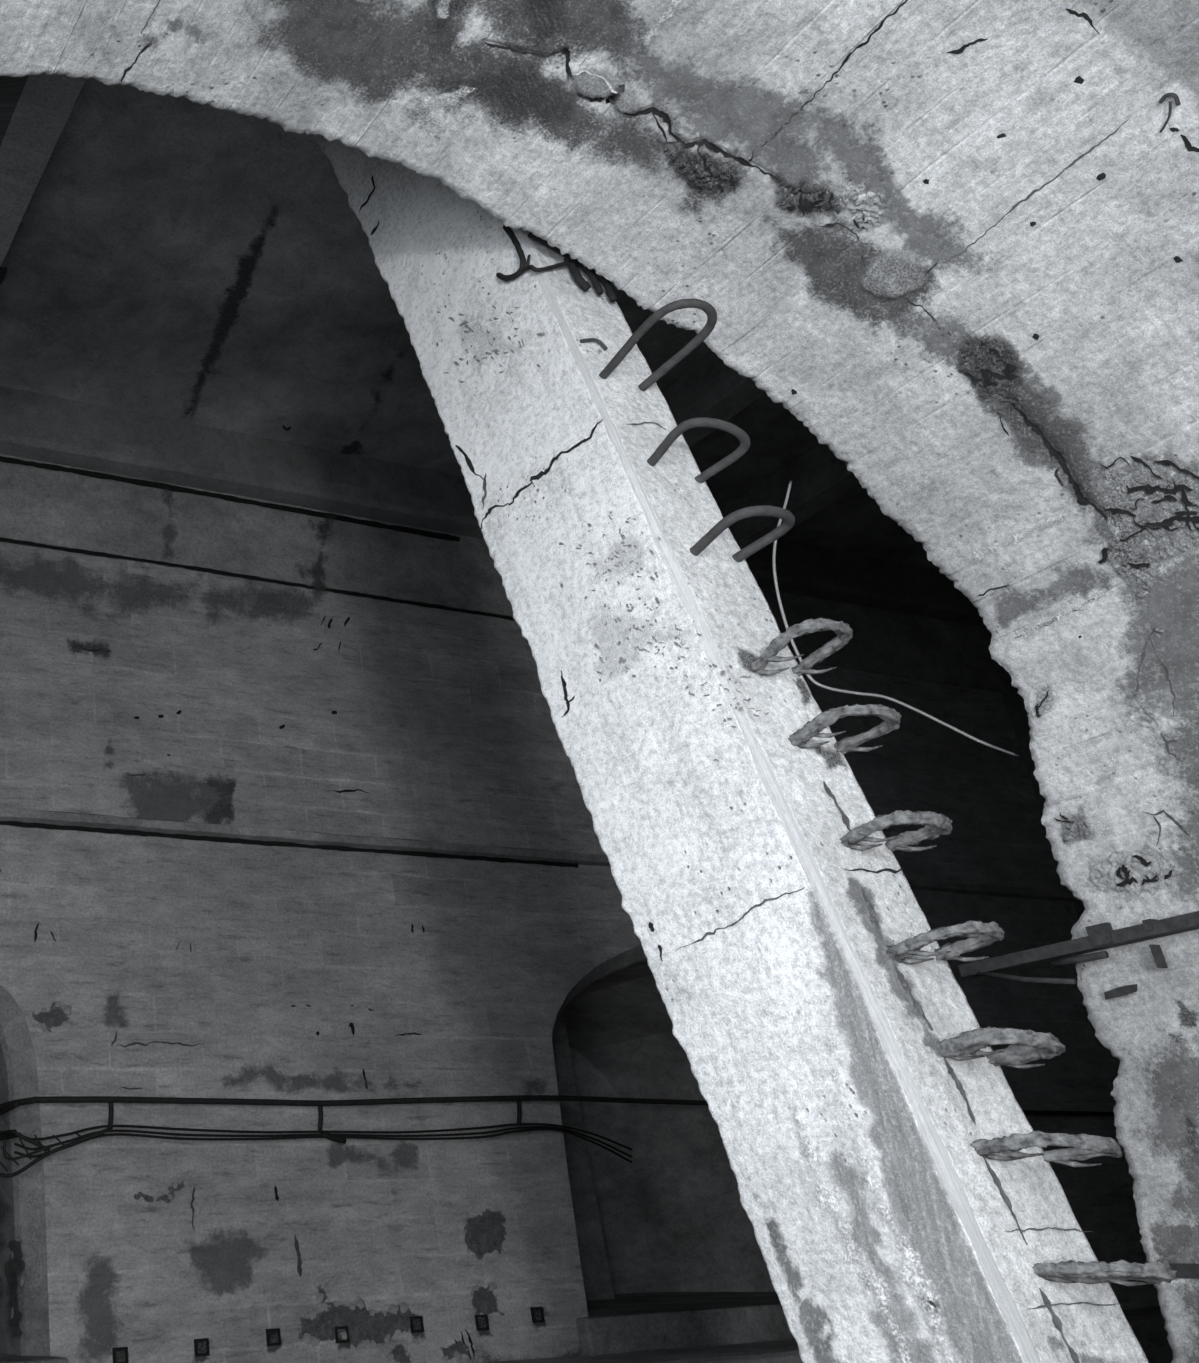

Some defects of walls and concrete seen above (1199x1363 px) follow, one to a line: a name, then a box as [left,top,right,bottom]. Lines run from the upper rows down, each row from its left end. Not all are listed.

crack [484,0,908,194]
crack [455,419,666,531]
leakage [259,0,1199,895]
spalling [1089,448,1199,600]
rust [738,648,763,676]
rust [797,679,811,703]
rust [815,746,847,769]
crack [648,887,805,962]
spalling [1054,809,1095,844]
spalling [1088,846,1185,902]
leakage [793,878,1022,1363]
leakage [767,1220,840,1363]